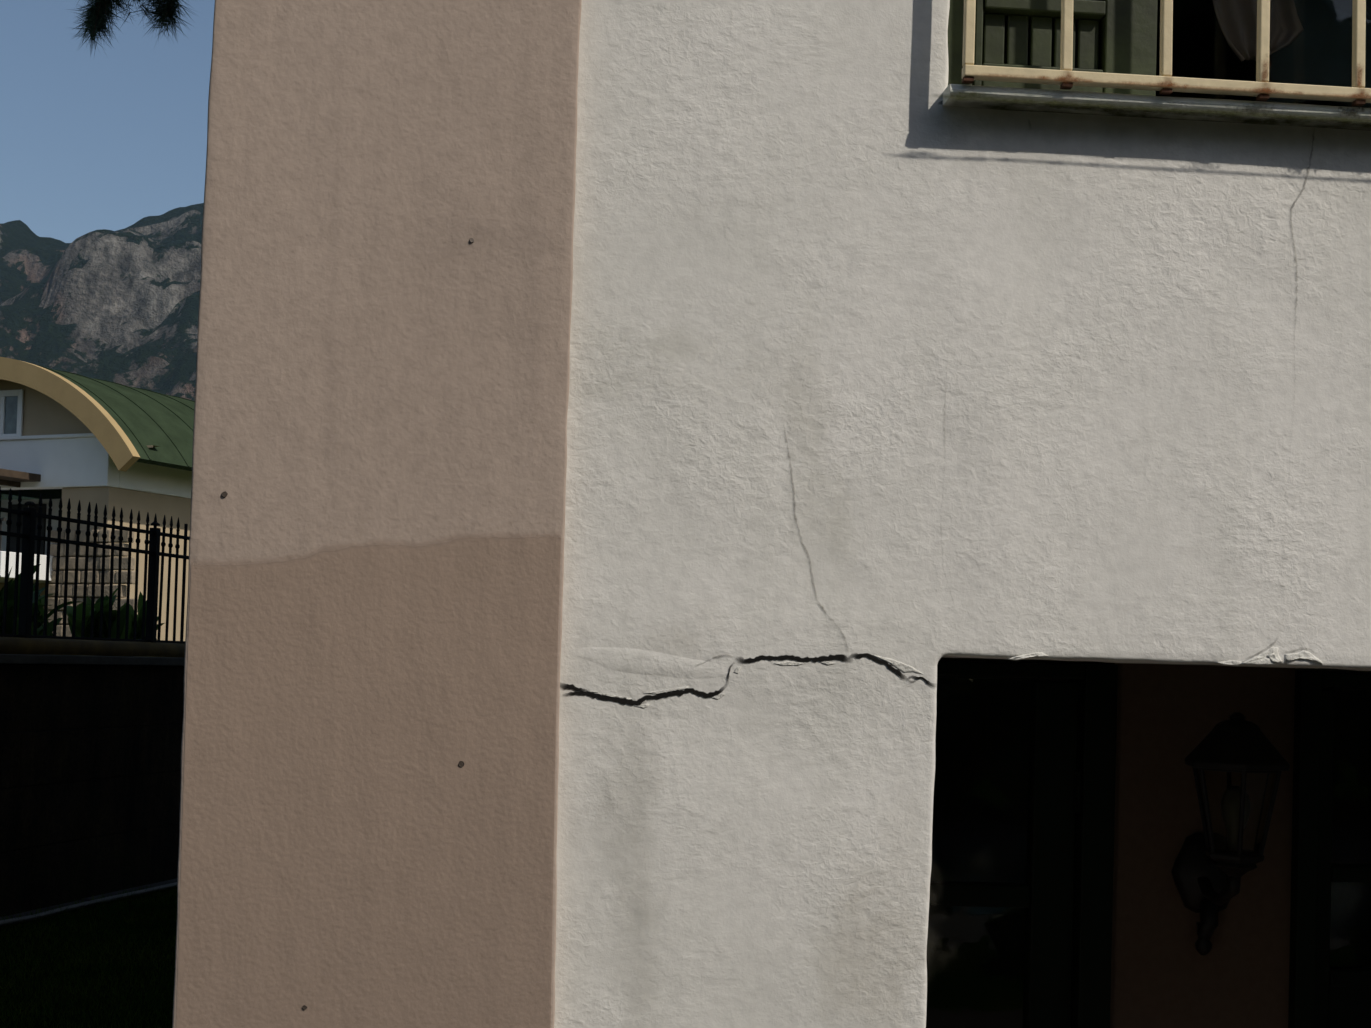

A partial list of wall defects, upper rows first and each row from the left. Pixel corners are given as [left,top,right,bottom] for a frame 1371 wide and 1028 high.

flaking render [1008,652,1048,661]
flaking render [1217,647,1322,666]
crack [561,653,933,708]